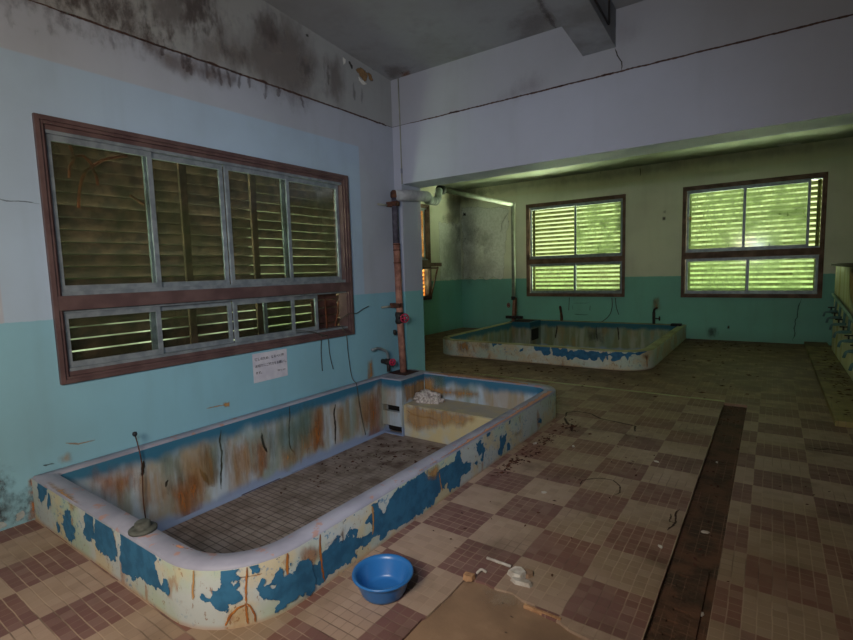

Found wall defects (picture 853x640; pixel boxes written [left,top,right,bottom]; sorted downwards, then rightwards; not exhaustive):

peeling [534,346,647,362]
peeling [37,483,72,510]
peeling [56,509,170,596]